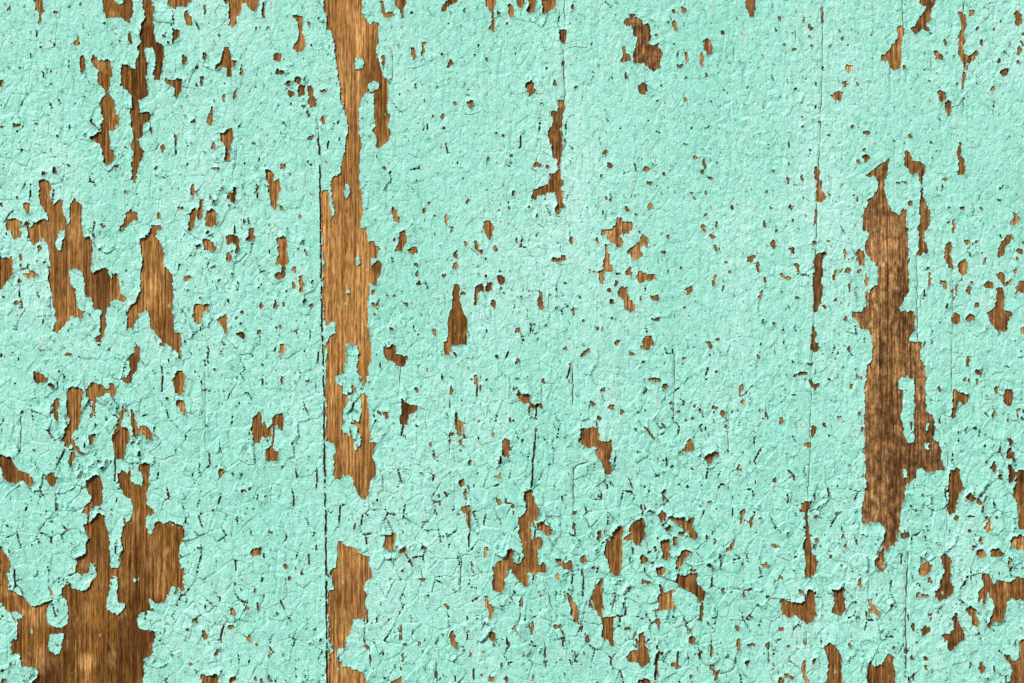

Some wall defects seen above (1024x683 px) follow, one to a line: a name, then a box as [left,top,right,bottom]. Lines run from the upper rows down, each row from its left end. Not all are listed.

crack [316,117,330,683]
peeling [0,0,696,683]
crack [460,511,470,589]
crack [530,435,538,486]
peeling [437,432,744,683]
peeling [731,130,1024,683]